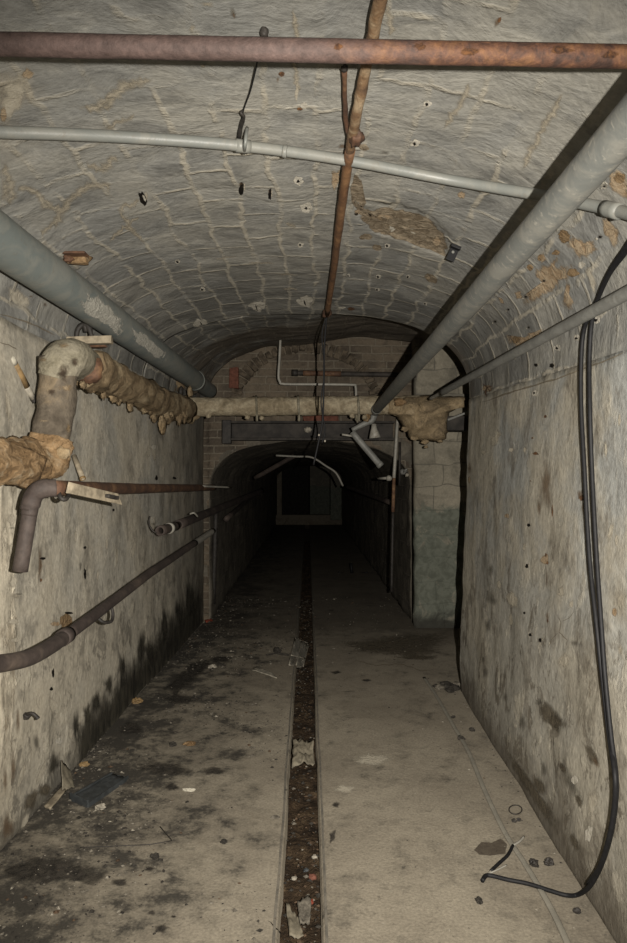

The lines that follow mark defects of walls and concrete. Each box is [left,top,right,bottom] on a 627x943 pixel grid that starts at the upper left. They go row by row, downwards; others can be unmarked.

spalling [350,174,447,256]
peeling [600,170,627,197]
peeling [515,219,618,307]
damp [74,583,204,761]
damp [165,657,229,703]
damp [142,763,186,790]